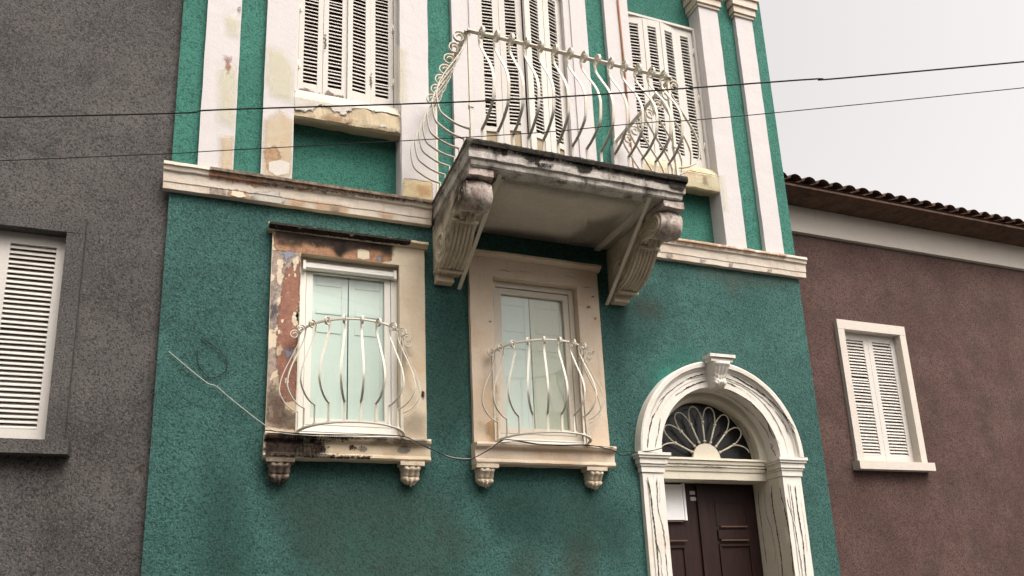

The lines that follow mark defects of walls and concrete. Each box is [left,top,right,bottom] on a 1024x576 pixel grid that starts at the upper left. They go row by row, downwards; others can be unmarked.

peeling [209,88,401,204]
damp [525,152,554,168]
damp [665,173,688,191]
peeling [266,231,392,430]
damp [263,433,426,460]
crack [647,373,807,576]